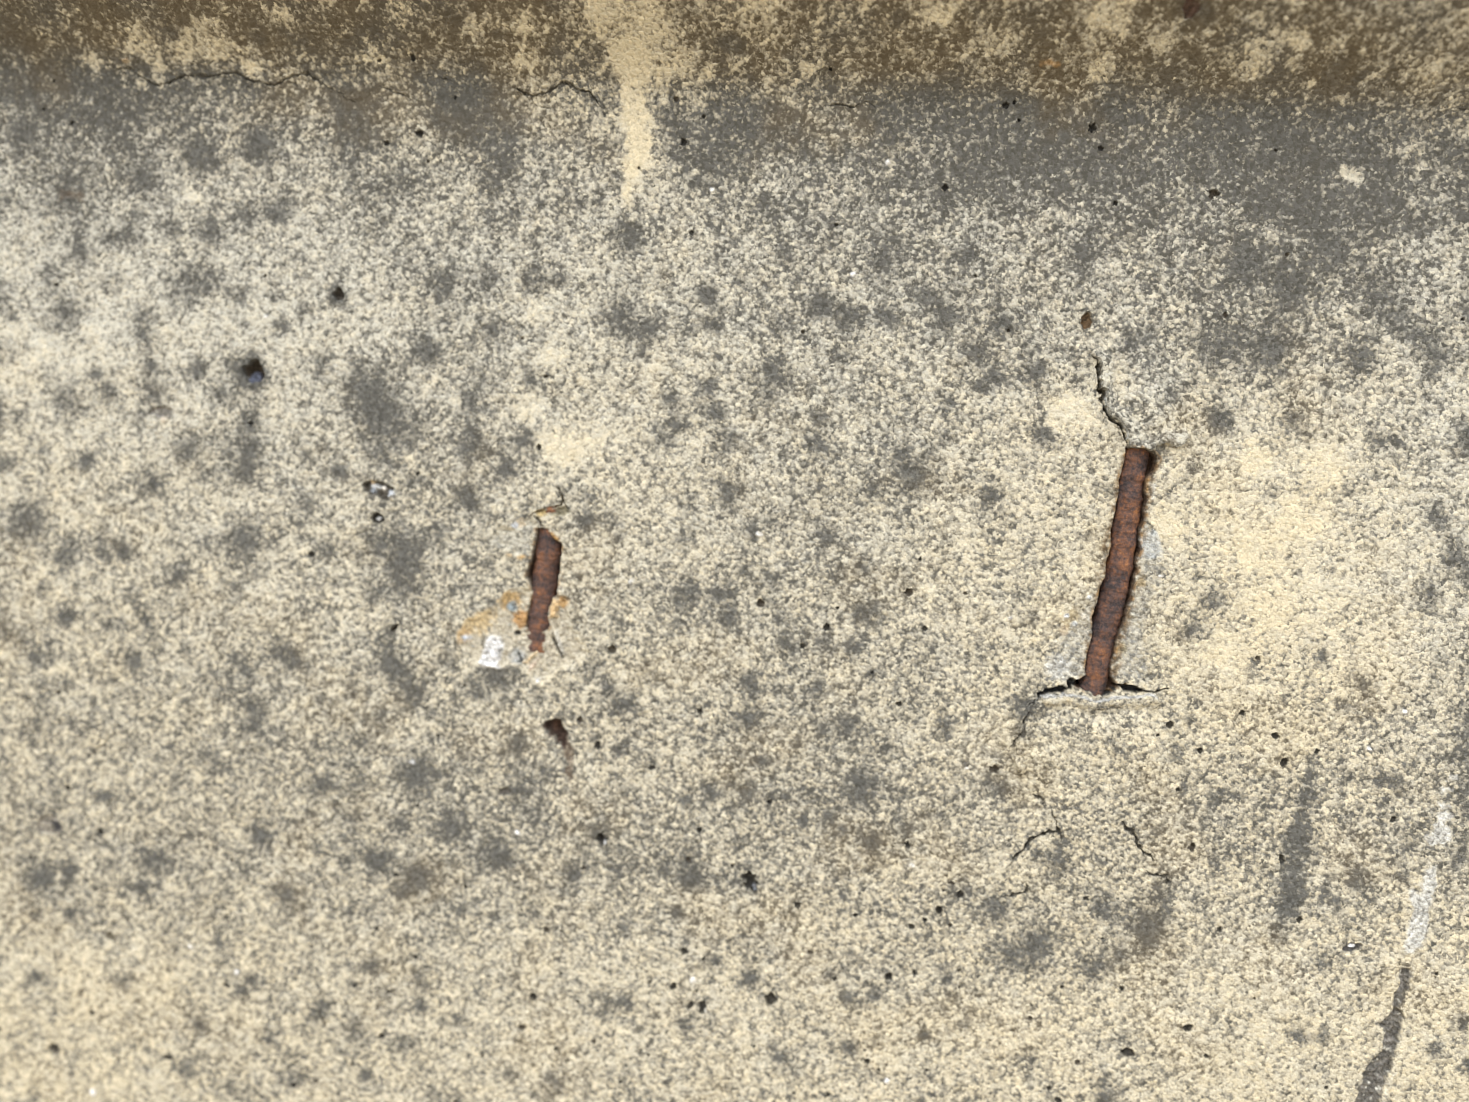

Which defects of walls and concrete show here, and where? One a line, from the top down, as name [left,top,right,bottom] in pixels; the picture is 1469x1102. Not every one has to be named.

spalling [453,482,595,689]
rust [527,506,562,653]
spalling [1040,444,1170,694]
rust [1078,448,1149,696]